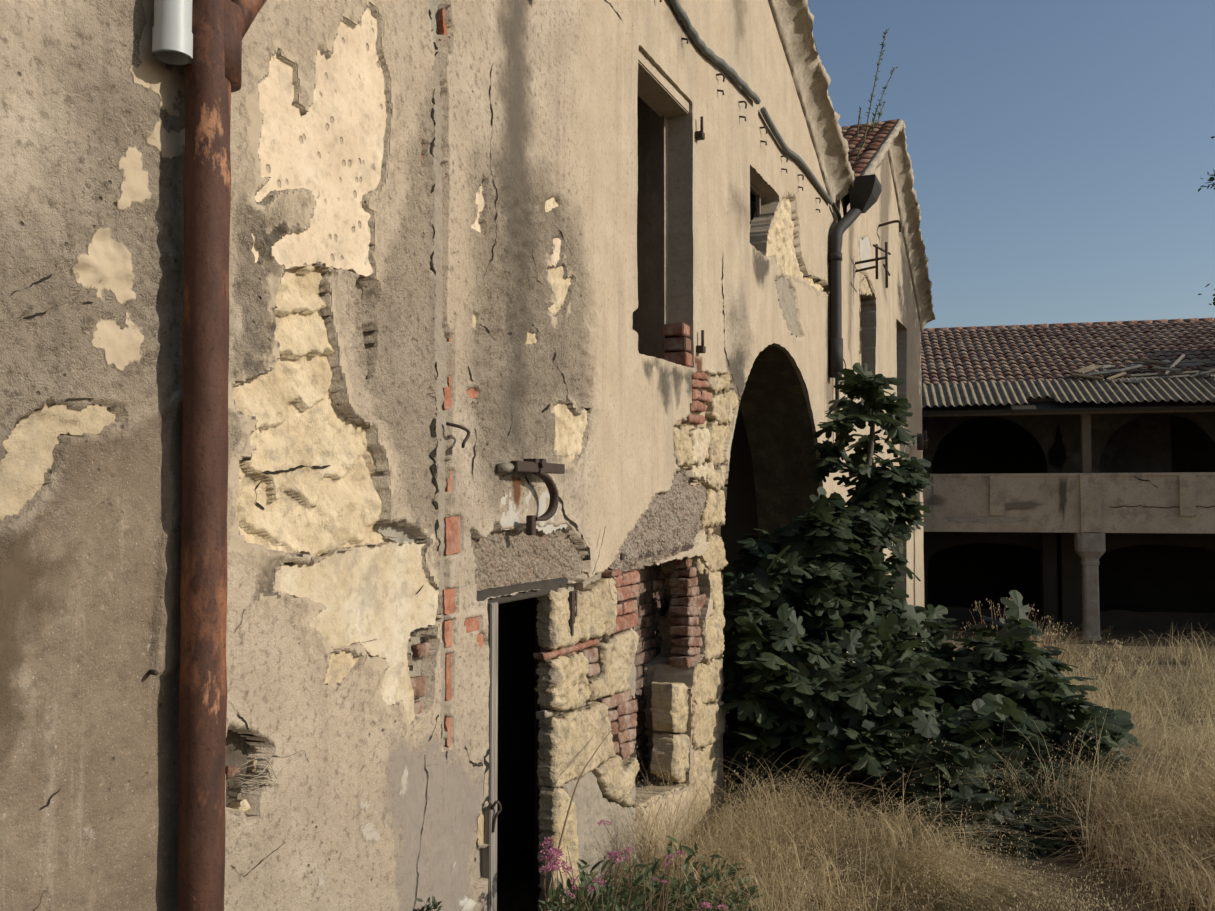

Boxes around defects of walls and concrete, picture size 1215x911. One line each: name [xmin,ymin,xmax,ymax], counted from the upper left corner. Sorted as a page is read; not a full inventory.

flaking render [0,402,116,520]
flaking render [72,227,144,371]
flaking render [117,0,185,210]
spalling [227,0,442,742]
flaking render [471,183,485,232]
leakage [501,0,530,282]
flaking render [547,237,571,315]
flaking render [554,403,588,462]
flaking render [765,198,824,337]
leakage [0,539,46,718]
flaking render [225,730,278,813]
crack [414,715,490,907]